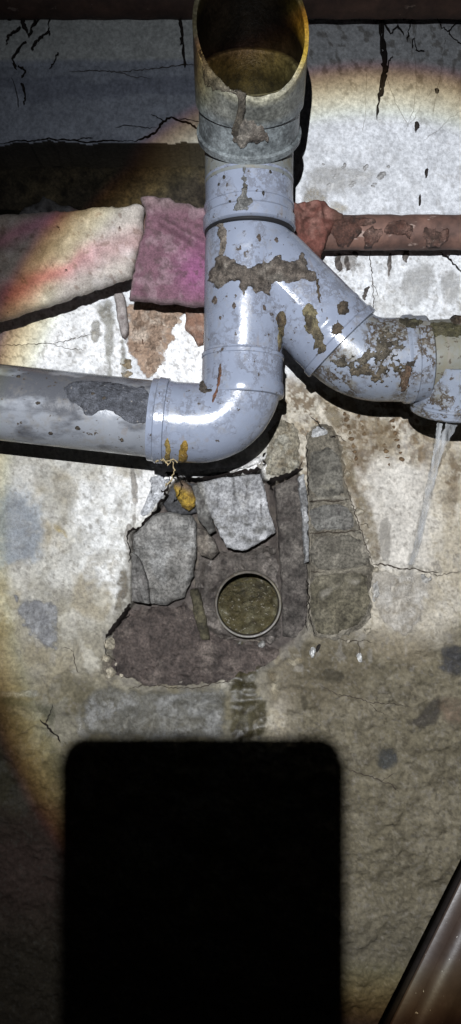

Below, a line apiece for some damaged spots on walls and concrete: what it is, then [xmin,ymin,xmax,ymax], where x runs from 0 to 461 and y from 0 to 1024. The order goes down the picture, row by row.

crack [0,114,199,144]
peeling [120,302,185,378]
flaking render [305,424,379,658]
crack [344,482,460,576]
flaking render [83,456,282,739]
water stain [440,646,461,675]
crack [40,704,61,743]
water stain [414,699,461,726]